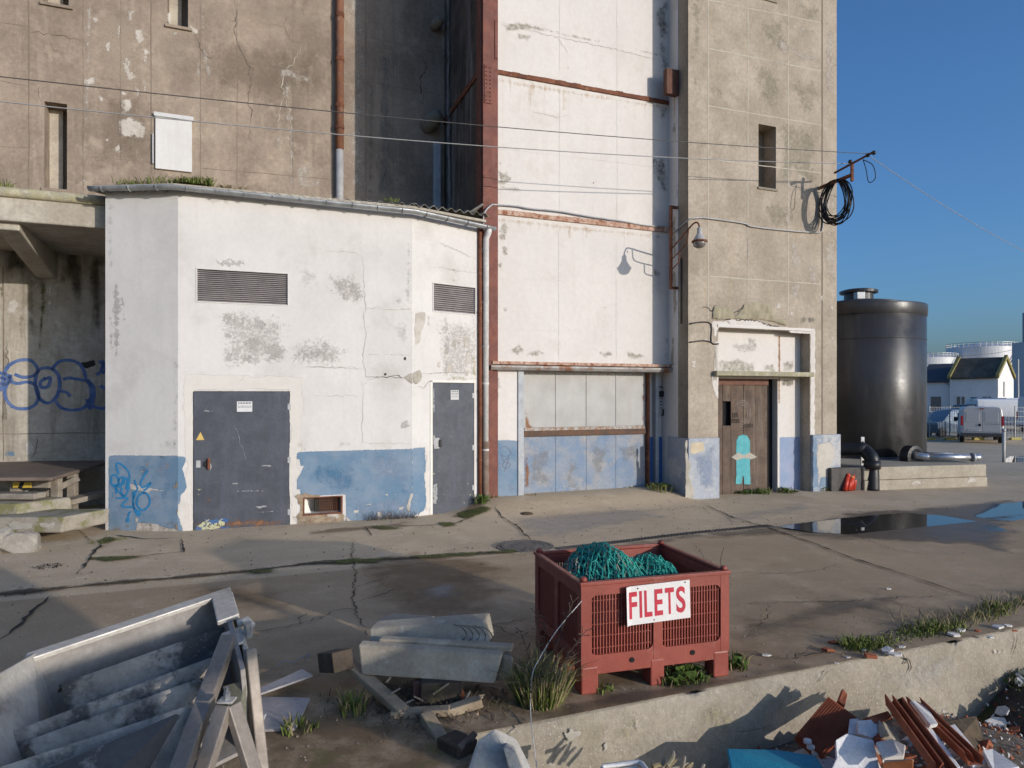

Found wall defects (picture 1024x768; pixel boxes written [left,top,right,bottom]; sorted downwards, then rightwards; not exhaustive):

peeling [106,58,147,152]
peeling [105,11,149,63]
crack [234,0,255,139]
water stain [9,251,42,323]
water stain [63,255,99,324]
peeling [224,314,284,362]
crack [303,251,471,444]
peeling [414,312,430,345]
peeling [705,319,771,398]
spalling [295,493,413,524]